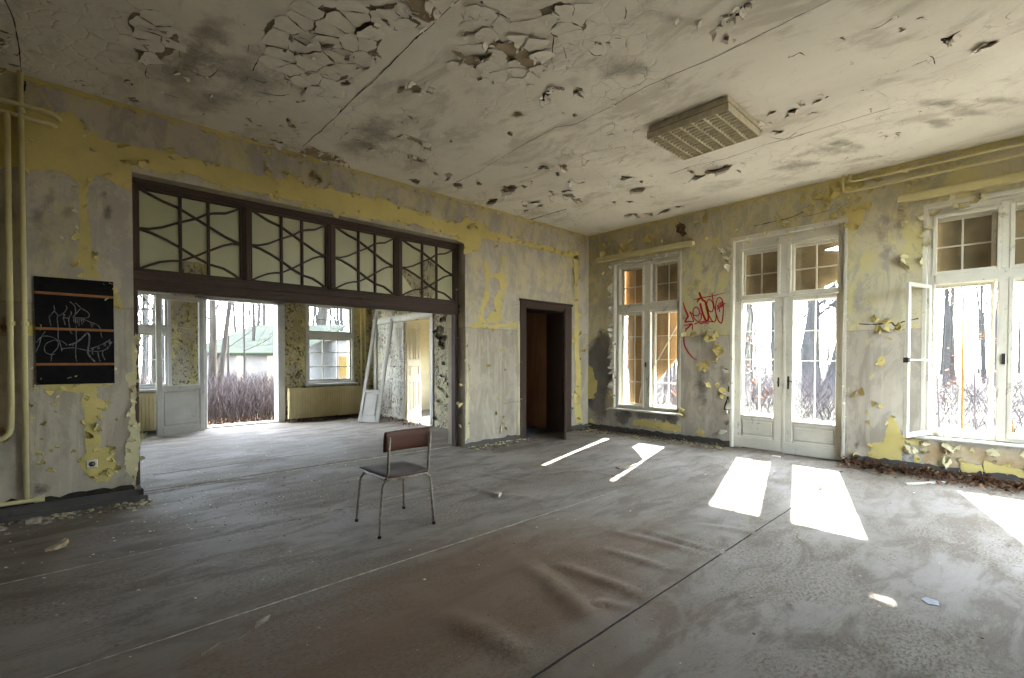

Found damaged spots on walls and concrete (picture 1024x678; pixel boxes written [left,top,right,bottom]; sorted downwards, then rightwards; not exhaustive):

crack [303,0,459,146]
peeling [0,0,1024,440]
peeling [29,334,147,489]
leakage [588,334,678,425]
spalling [842,385,1024,478]